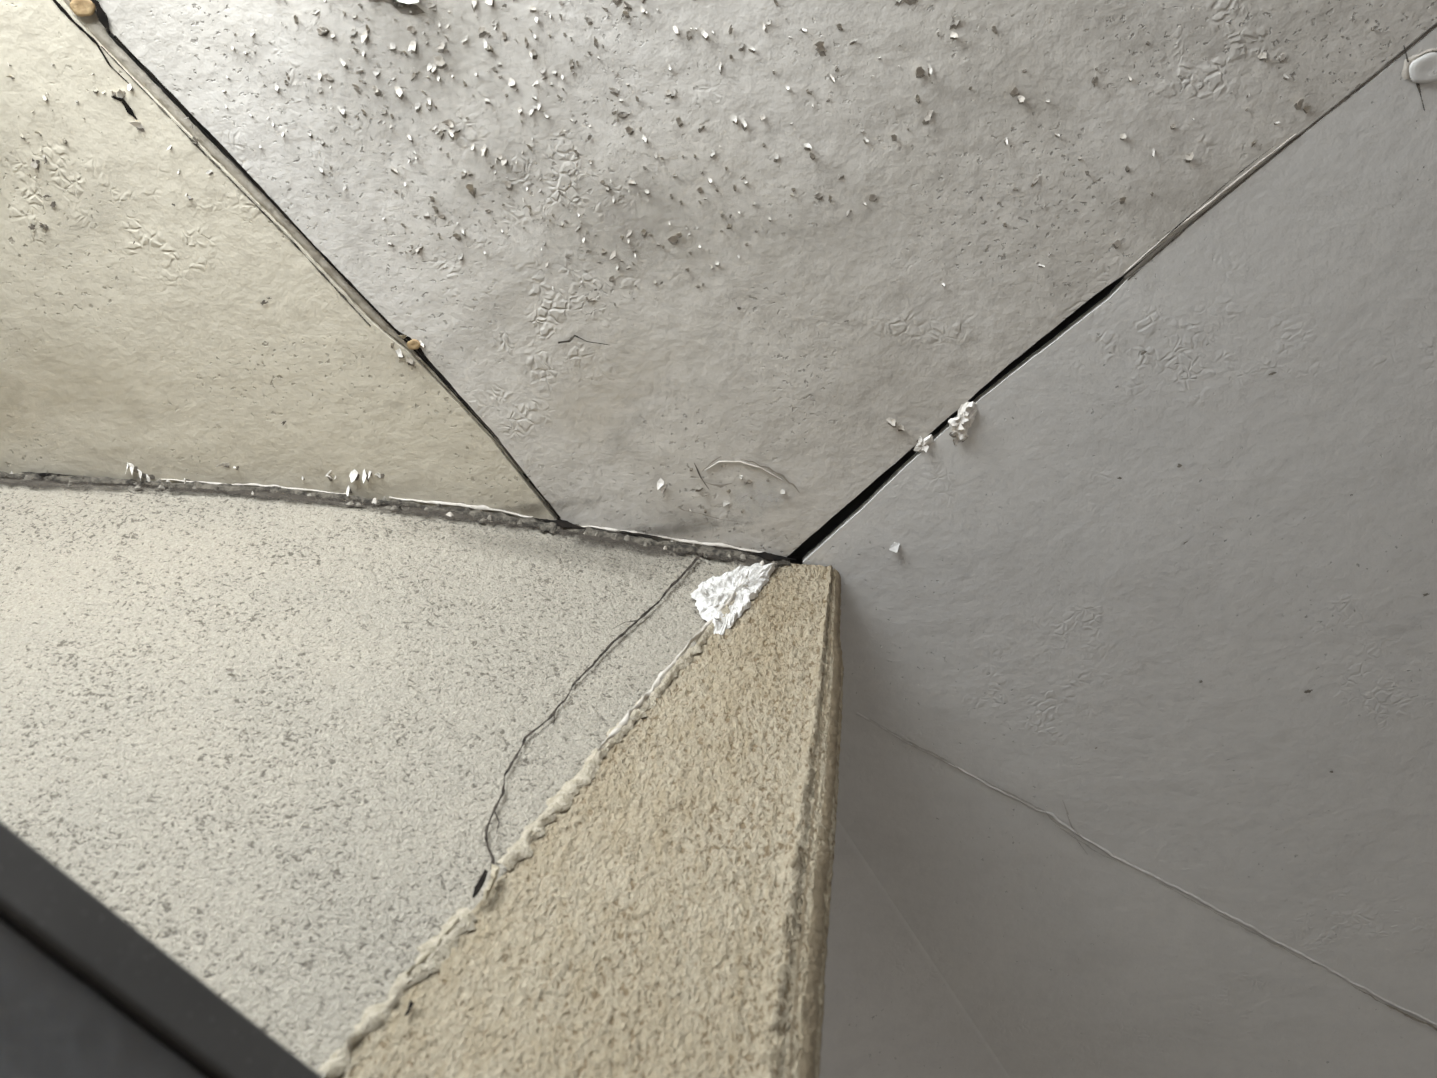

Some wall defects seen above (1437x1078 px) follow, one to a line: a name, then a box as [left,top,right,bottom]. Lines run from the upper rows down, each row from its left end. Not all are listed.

peeling [257,0,720,306]
peeling [670,146,748,205]
peeling [673,24,756,74]
peeling [763,0,838,107]
peeling [891,65,934,141]
peeling [937,15,961,40]
peeling [886,401,977,452]
crack [678,456,799,522]
crack [485,553,704,870]
spalling [497,563,777,871]
crack [856,712,1437,1031]
spalling [316,907,477,1078]